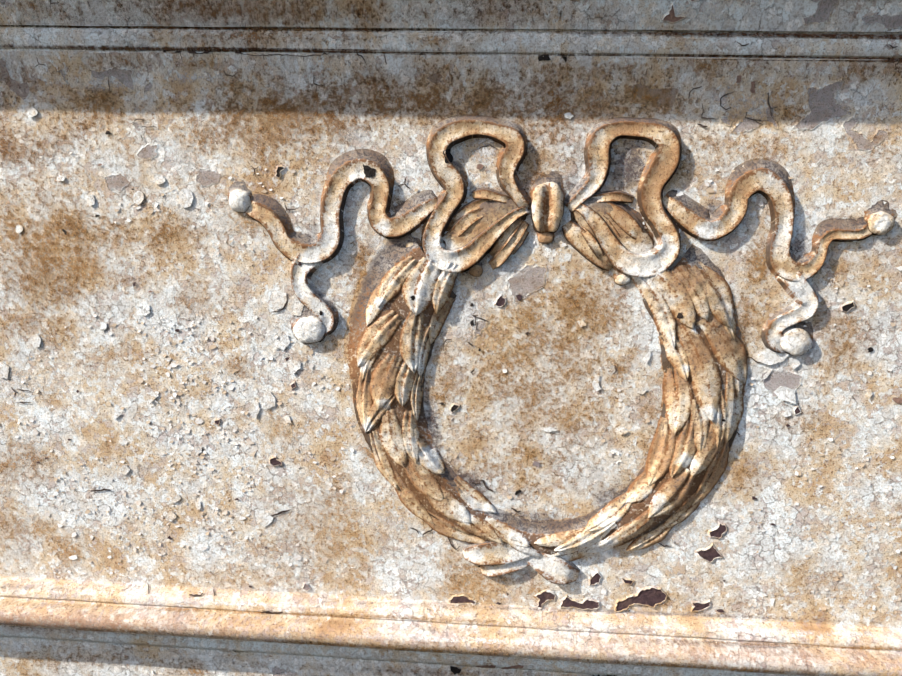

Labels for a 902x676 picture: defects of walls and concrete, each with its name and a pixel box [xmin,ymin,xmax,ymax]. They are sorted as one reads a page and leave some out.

peeling [662,2,687,24]
peeling [802,0,840,26]
leakage [642,54,902,63]
crack [688,86,778,128]
peeling [695,522,728,563]
peeling [588,571,603,586]
peeling [448,593,478,607]
peeling [534,589,601,610]
peeling [614,576,667,612]
peeling [691,599,724,613]